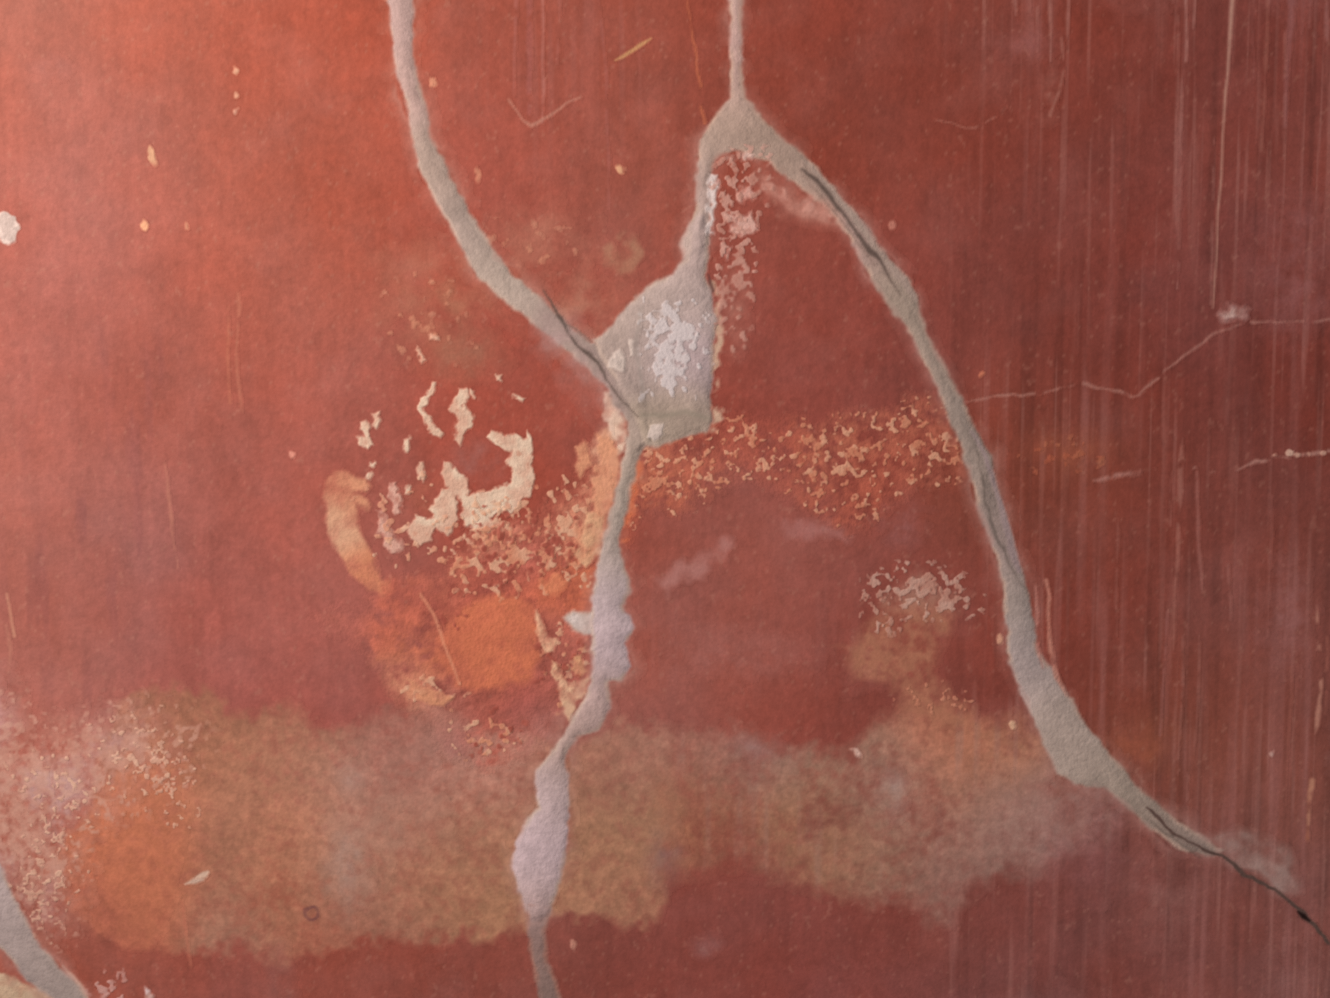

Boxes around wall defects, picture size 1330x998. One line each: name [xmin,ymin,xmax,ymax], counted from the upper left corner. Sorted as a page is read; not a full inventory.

peeling [413,332,441,366]
peeling [304,380,624,782]
peeling [493,372,528,404]
crack [376,0,652,998]
leakage [651,532,738,601]
peeling [624,387,960,549]
leakage [777,517,856,547]
crack [668,0,1330,951]
leakage [0,592,546,998]
leakage [555,620,1225,962]
crack [0,838,107,998]
leakage [1252,917,1326,998]